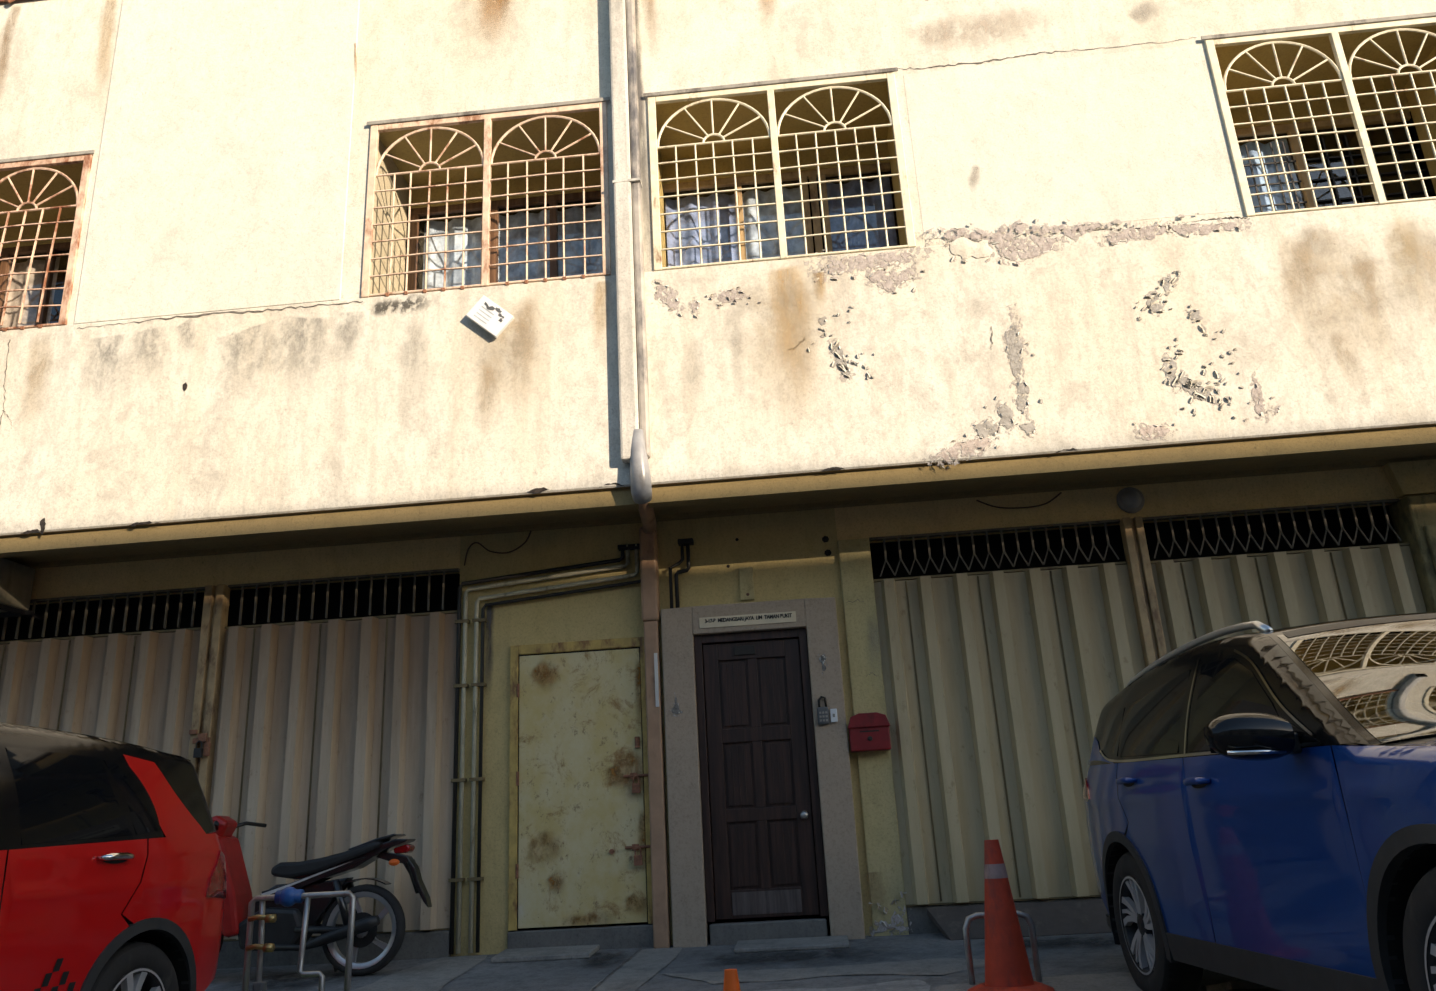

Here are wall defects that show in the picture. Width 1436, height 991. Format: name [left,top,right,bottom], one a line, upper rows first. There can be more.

crack [898,37,1197,69]
spalling [803,213,1252,294]
crack [0,341,12,429]
peeling [808,307,875,382]
spalling [922,303,1043,468]
peeling [1133,270,1281,441]